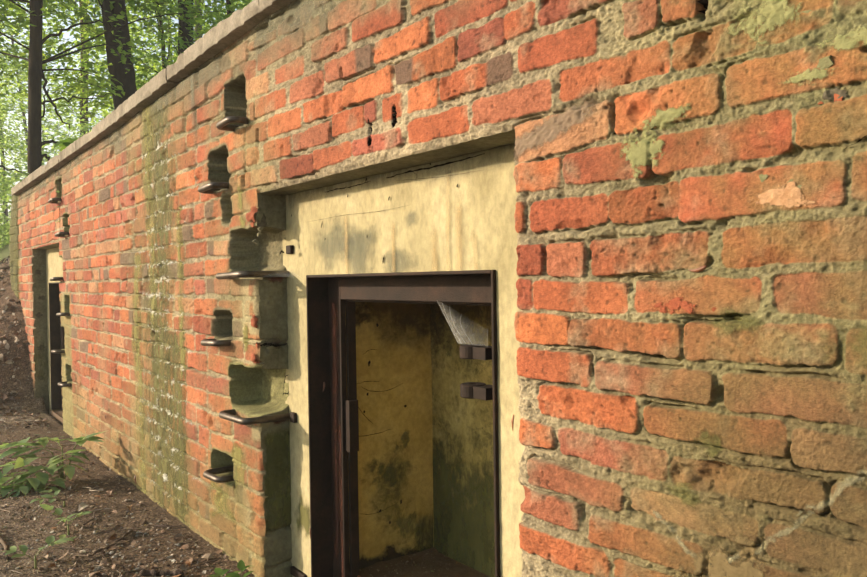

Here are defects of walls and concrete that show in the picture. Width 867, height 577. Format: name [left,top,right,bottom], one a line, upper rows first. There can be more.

damp [254,0,332,44]
crack [327,153,485,192]
damp [321,227,373,271]
damp [132,55,221,524]
damp [345,301,492,348]
damp [359,517,434,569]